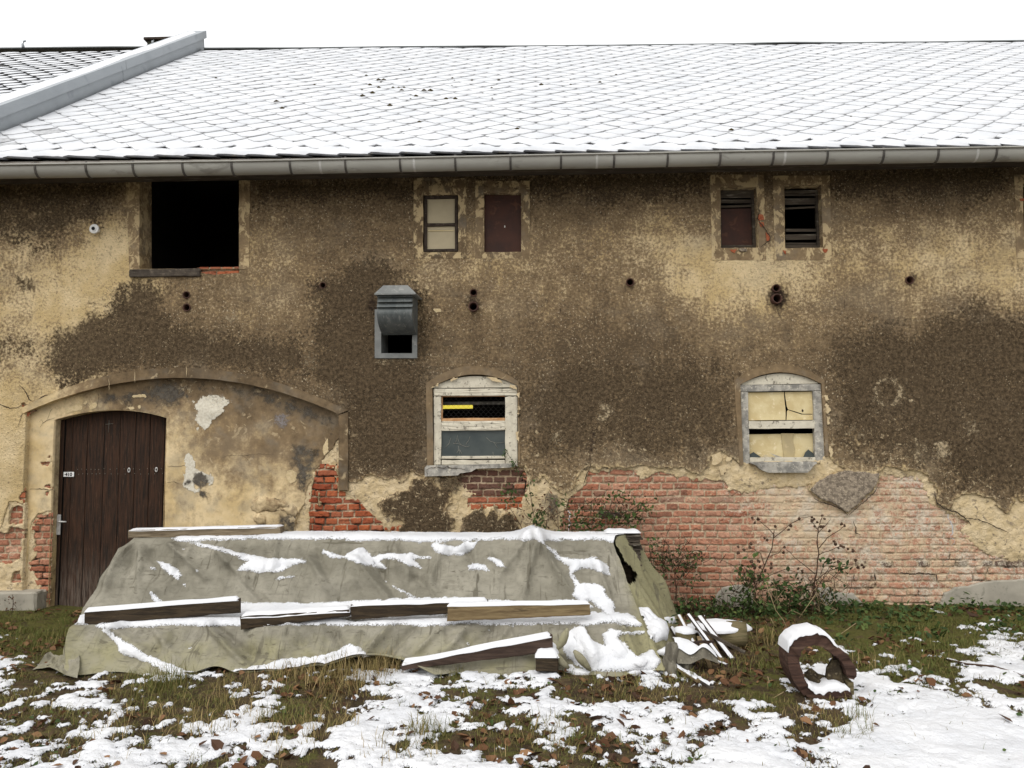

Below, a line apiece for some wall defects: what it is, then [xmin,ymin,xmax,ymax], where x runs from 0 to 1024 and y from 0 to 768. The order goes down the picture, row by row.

peeling [192,395,232,431]
damp [0,253,519,533]
damp [519,352,734,458]
damp [829,296,1024,496]
spalling [0,488,54,607]
peeling [183,453,214,497]
spalling [250,439,1024,607]
crack [934,492,1009,533]